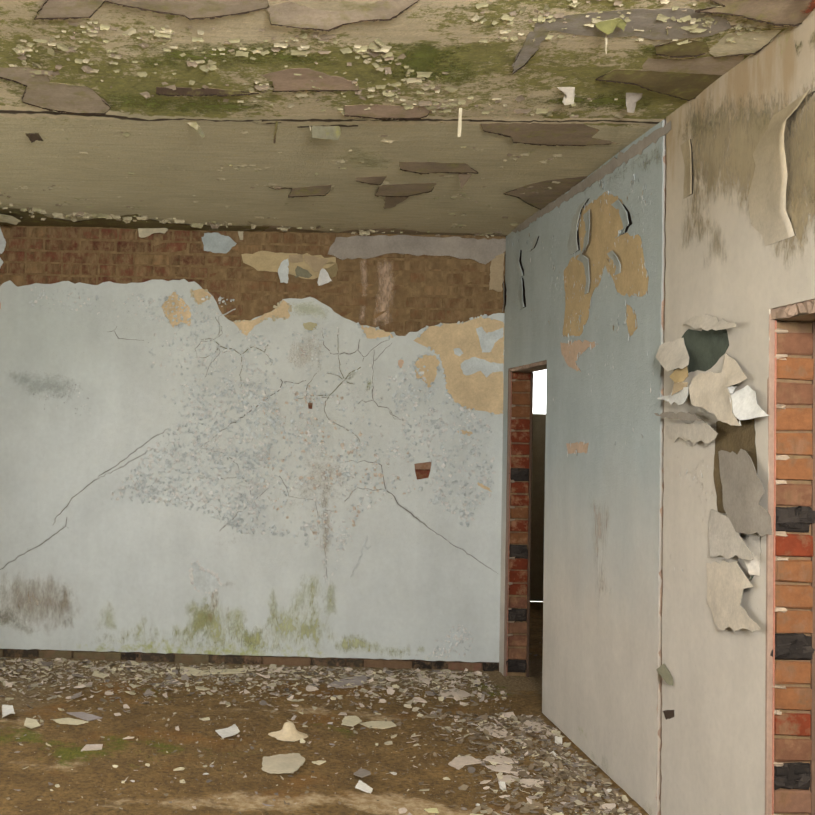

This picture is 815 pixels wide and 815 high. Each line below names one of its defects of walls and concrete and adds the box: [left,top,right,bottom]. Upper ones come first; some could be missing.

peeling [471,0,812,119]
flaking render [0,0,671,416]
damp [692,100,784,207]
damp [776,95,815,255]
crack [0,428,168,570]
crack [194,309,499,577]